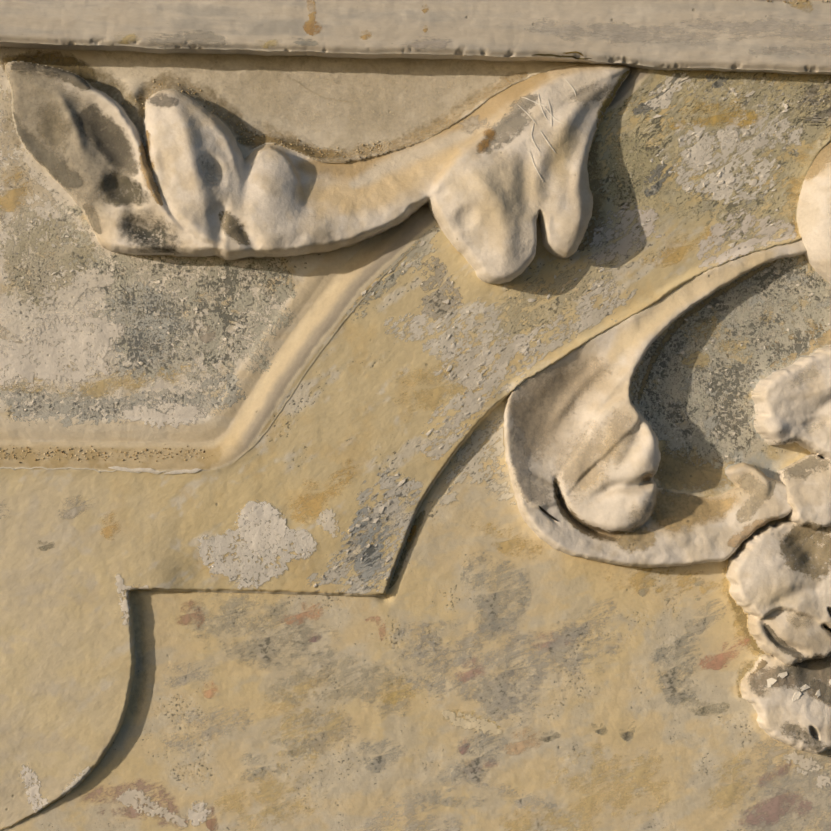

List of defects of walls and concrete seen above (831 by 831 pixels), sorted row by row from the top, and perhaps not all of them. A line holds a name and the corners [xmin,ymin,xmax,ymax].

peeling [0,85,296,427]
peeling [346,71,831,469]
peeling [307,467,423,594]
leakage [788,522,822,540]